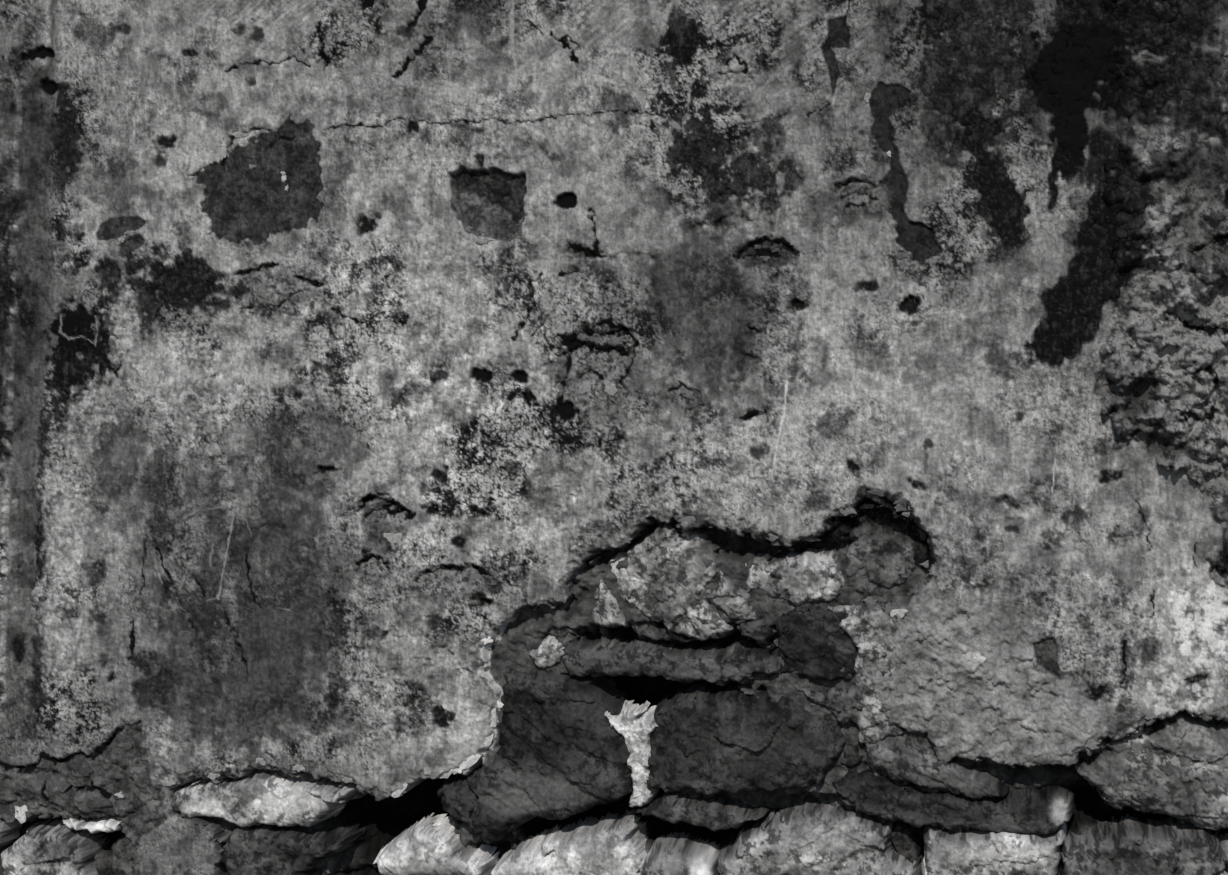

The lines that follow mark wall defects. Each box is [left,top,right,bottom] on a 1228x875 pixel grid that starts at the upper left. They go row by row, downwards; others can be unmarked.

peeling [821,0,850,95]
leakage [53,85,91,210]
leakage [101,158,136,209]
spalling [443,154,526,244]
peeling [864,82,942,265]
leakage [906,0,1228,365]
leakage [985,337,1010,373]
flaking render [1094,0,1228,587]
leakage [0,167,250,712]
peeling [0,461,1177,845]
spalling [1185,674,1208,684]
crack [0,720,141,801]